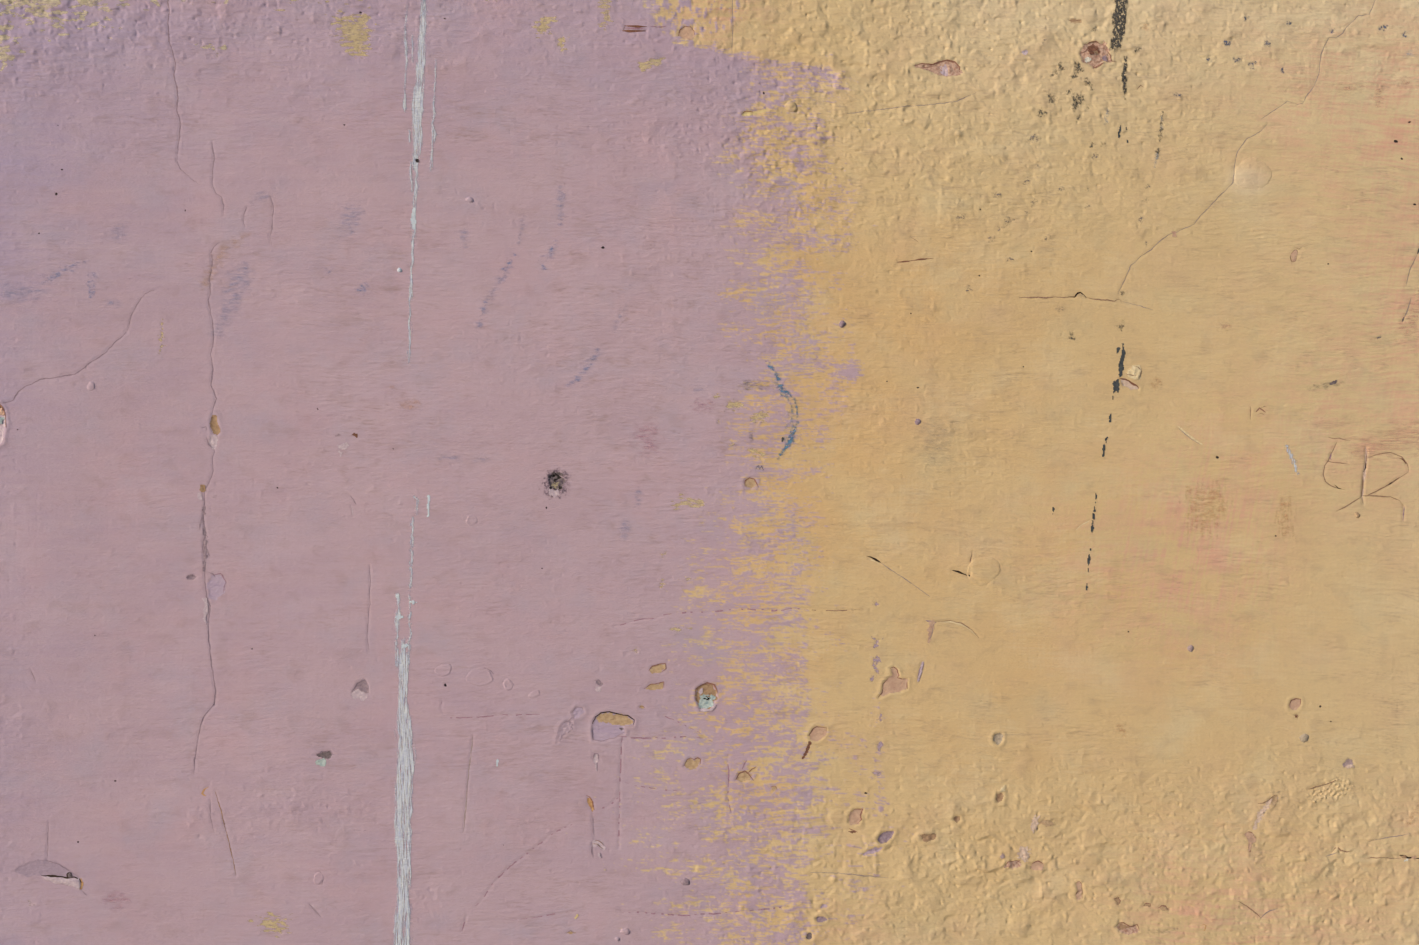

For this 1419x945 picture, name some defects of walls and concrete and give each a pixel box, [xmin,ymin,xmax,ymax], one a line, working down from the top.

peeling [914,59,963,77]
spalling [1080,40,1117,69]
crack [1019,1,1375,310]
crack [167,0,274,412]
crack [1,290,153,404]
flaking render [548,472,565,498]
crack [194,450,236,874]
peeling [870,638,908,696]
peeling [592,663,667,771]
peeling [698,688,716,712]
peeling [15,859,86,895]